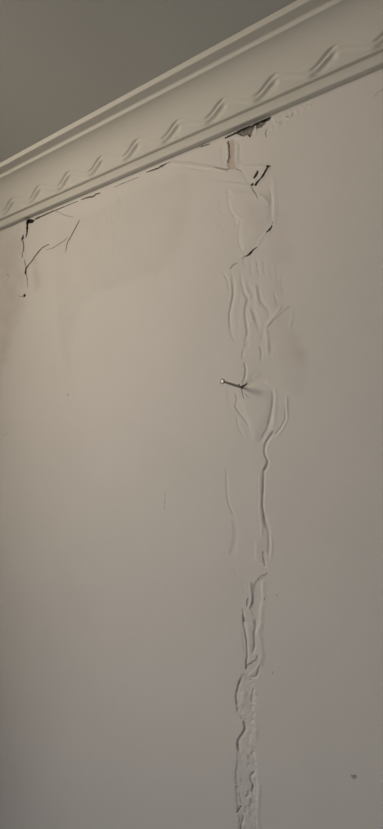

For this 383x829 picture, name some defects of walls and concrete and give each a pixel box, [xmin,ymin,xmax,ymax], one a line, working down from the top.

peeling [220,103,315,169]
crack [20,162,169,287]
crack [240,571,269,681]